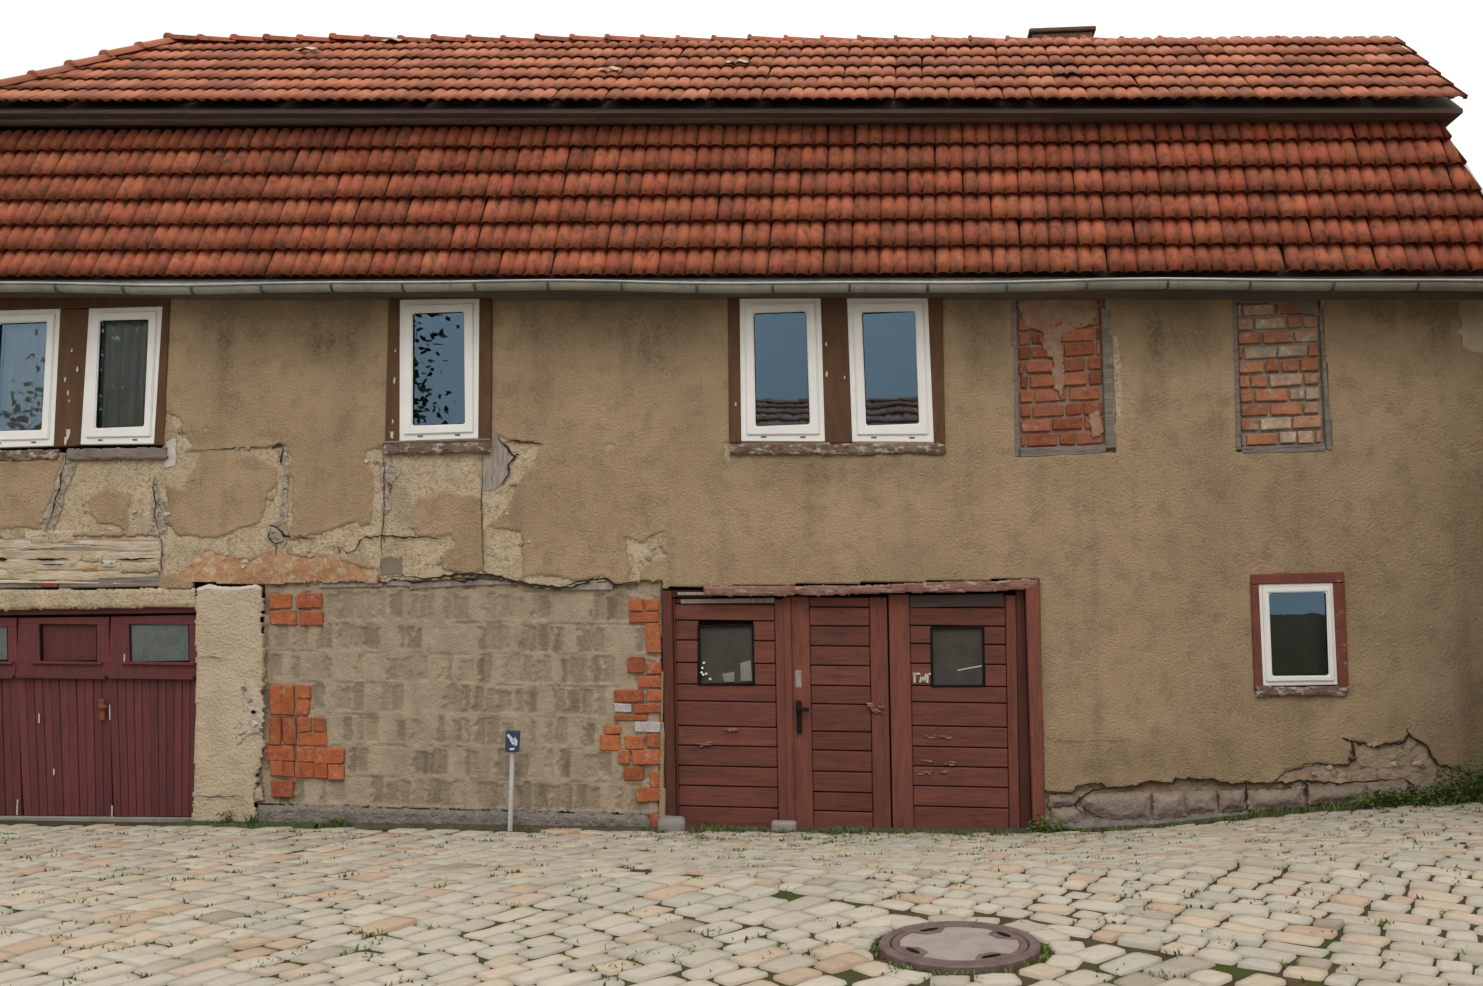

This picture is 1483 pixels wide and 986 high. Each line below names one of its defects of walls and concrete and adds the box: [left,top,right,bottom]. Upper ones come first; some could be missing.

crack [46,457,66,528]
flaking render [0,411,609,626]
crack [264,436,658,590]
flaking render [236,678,345,803]
flaking render [600,532,666,826]
crack [1049,728,1483,813]